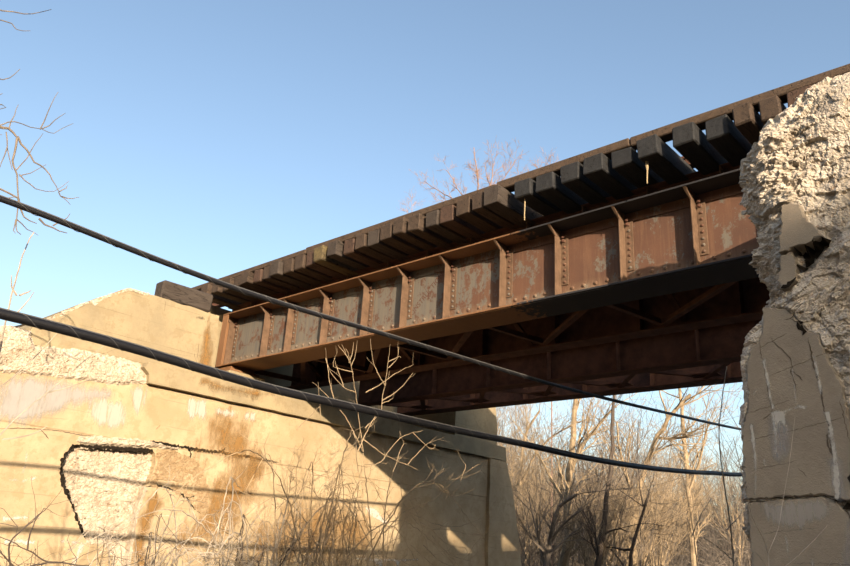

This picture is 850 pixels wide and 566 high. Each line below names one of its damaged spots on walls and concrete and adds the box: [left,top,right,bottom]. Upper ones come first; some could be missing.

spalling [752,72,850,417]
spalling [0,325,147,386]
spalling [60,435,209,566]
spalling [739,319,810,566]
crack [745,494,850,518]
crack [749,315,850,482]